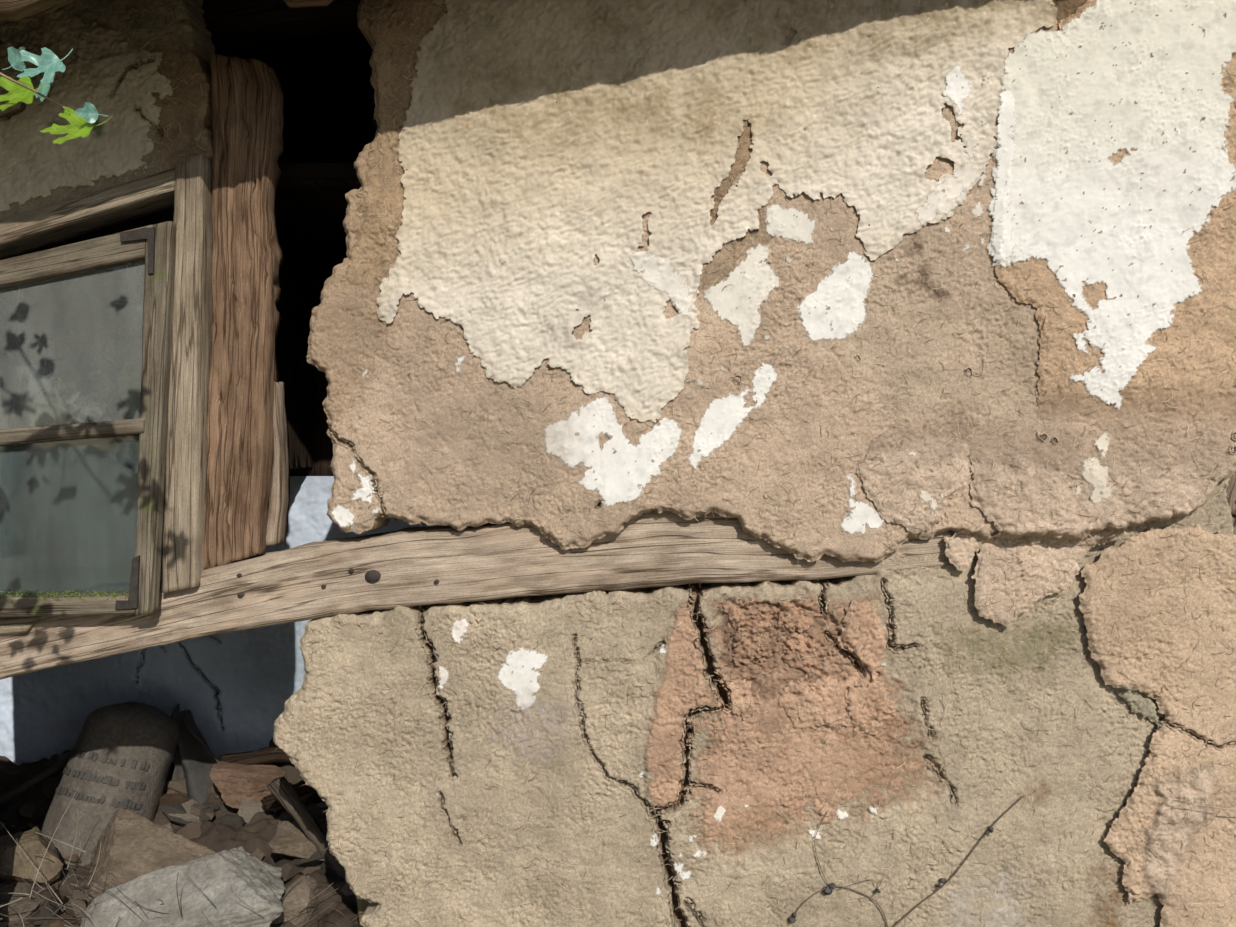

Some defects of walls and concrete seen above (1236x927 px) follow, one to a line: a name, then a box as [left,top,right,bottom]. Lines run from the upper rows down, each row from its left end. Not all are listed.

peeling [346,0,1236,506]
peeling [332,461,379,530]
peeling [840,475,884,534]
peeling [919,490,943,515]
crack [881,578,919,653]
crack [132,636,224,730]
crack [415,605,462,847]
crack [572,583,732,927]
spalling [639,594,925,880]
crack [921,698,958,805]